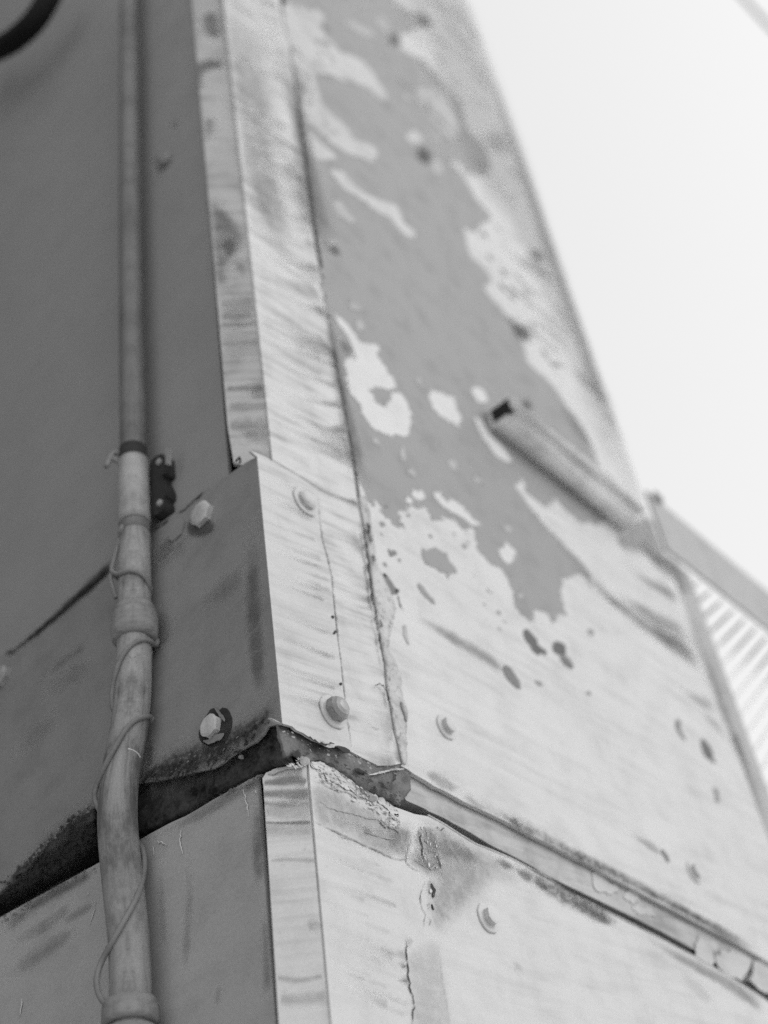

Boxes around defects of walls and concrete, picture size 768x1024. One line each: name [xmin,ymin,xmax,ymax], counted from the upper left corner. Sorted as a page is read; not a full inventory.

peeling [281,0,607,669]
spalling [268,756,404,833]
crack [318,782,444,1024]
peeling [503,665,521,689]